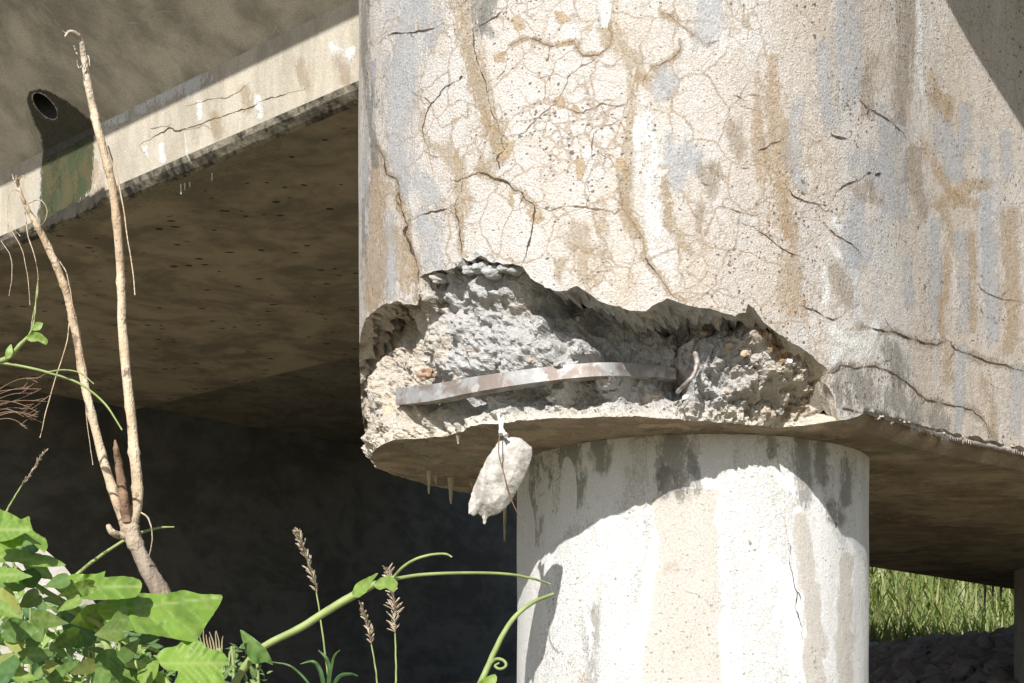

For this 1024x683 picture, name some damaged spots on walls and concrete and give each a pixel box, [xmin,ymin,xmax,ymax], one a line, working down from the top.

water stain [913,0,925,102]
water stain [25,73,282,231]
crack [140,85,301,164]
crack [374,12,717,300]
water stain [631,69,701,239]
crack [785,172,881,258]
rust [416,368,437,381]
spalling [359,251,1024,479]
water stain [826,317,880,367]
crack [828,360,992,436]
crack [800,305,1022,371]
water stain [716,439,794,683]